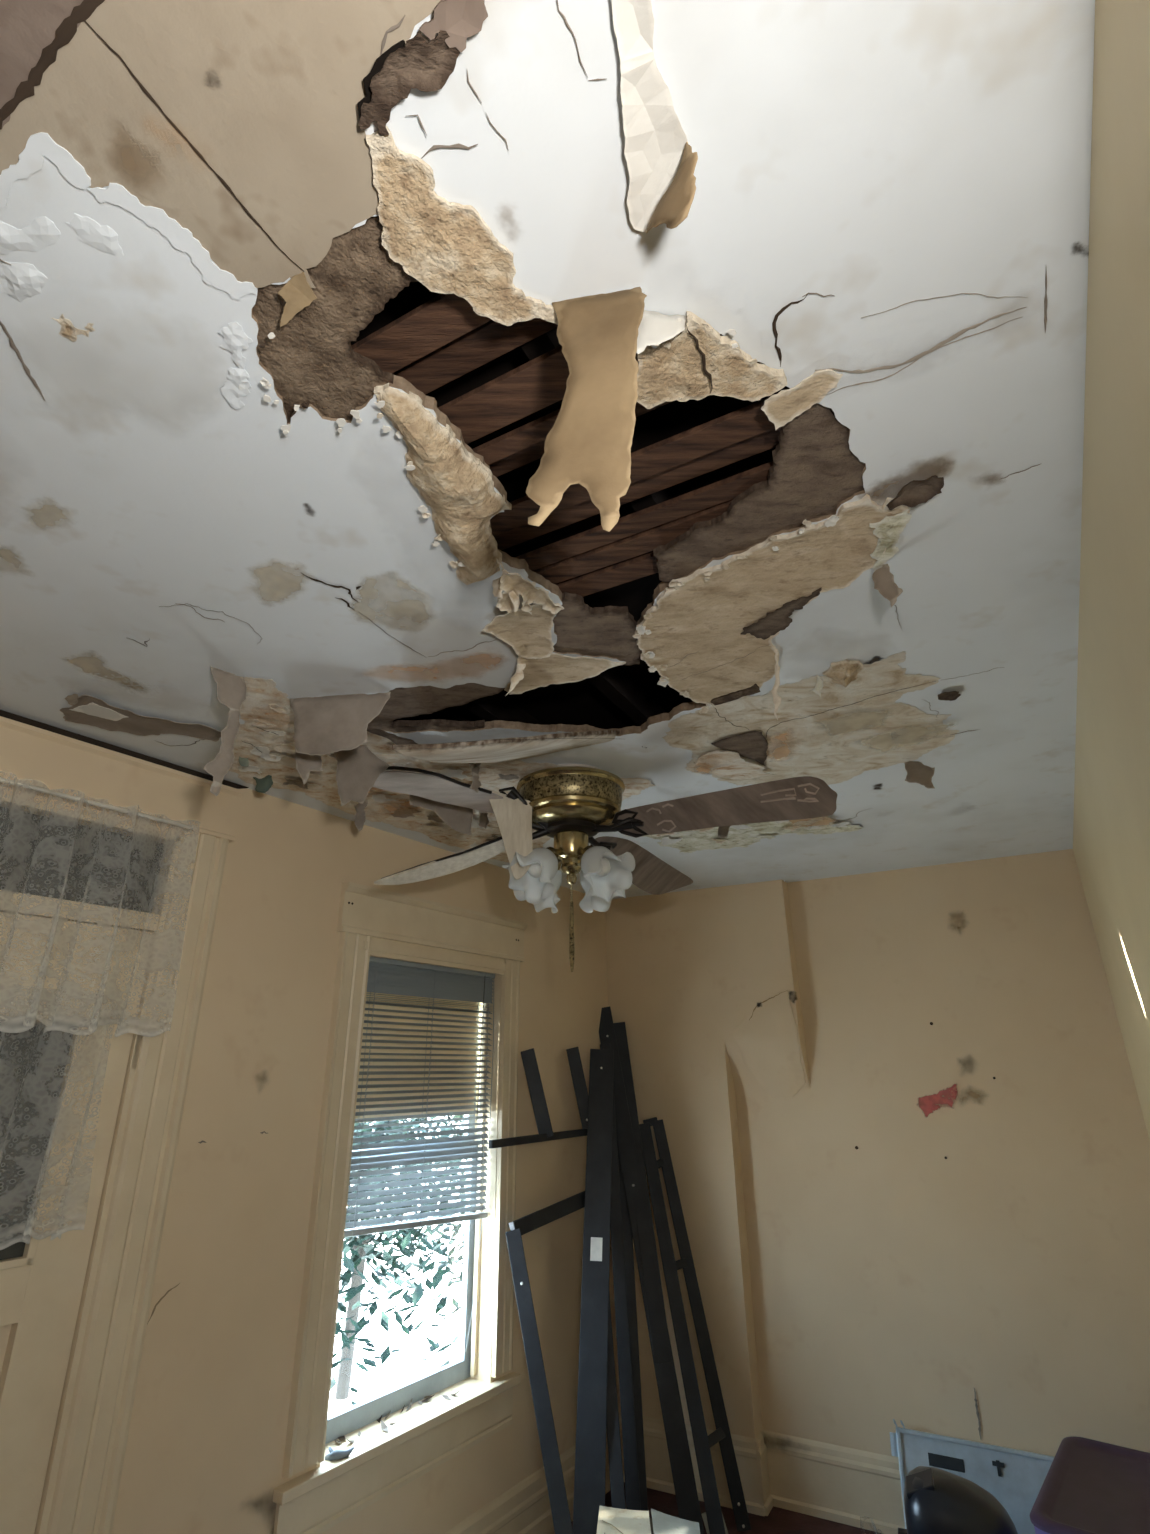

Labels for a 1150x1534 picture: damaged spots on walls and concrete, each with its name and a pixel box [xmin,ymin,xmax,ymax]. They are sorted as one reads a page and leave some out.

crack [0,0,304,271]
flaking render [0,0,1004,862]
crack [772,293,834,367]